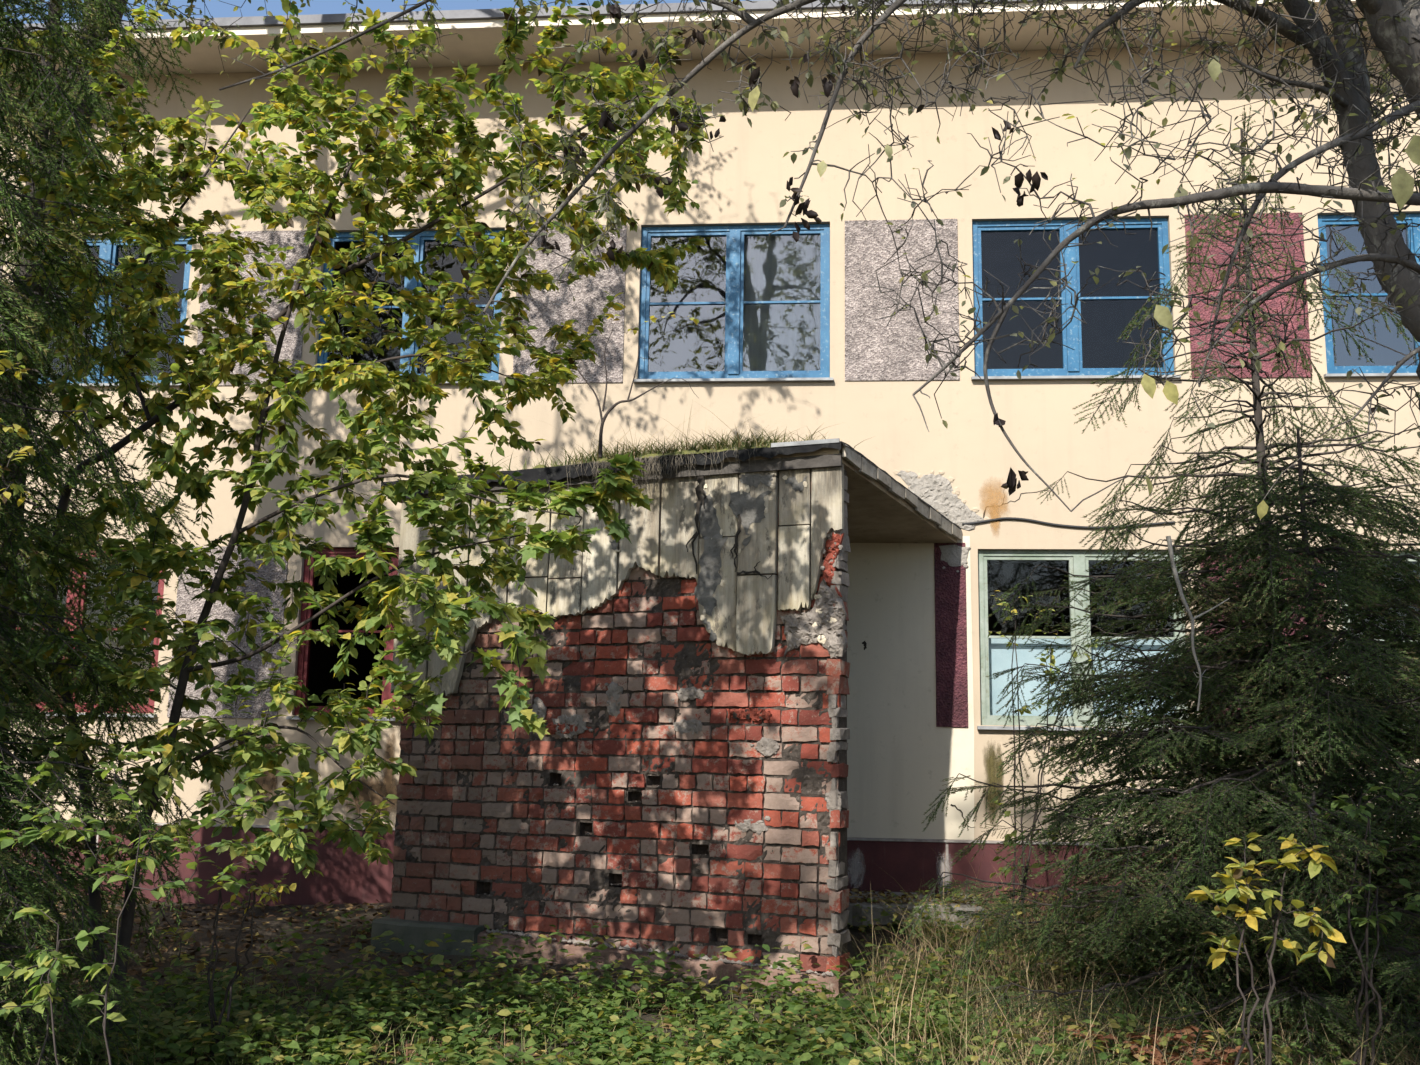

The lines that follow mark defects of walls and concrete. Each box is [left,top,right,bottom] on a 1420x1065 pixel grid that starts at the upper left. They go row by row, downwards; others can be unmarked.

flaking render [894,470,990,572]
peeling [694,473,807,646]
spalling [545,722,594,735]
spalling [779,475,851,975]
spalling [549,773,562,786]
hole [625,775,662,804]
spalling [578,822,592,836]
spalling [691,844,709,855]
spalling [609,873,622,886]
spalling [476,881,491,895]
hole [711,928,728,943]
hole [747,934,763,946]